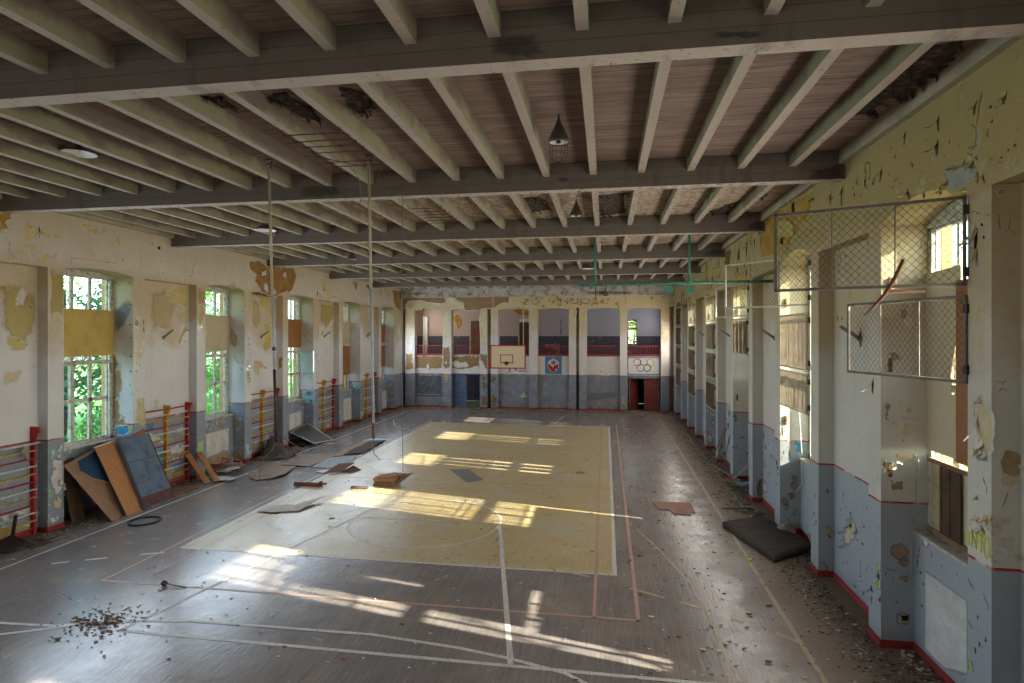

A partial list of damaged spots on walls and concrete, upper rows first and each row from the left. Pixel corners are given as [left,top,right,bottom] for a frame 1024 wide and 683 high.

peeling [922,116,985,199]
peeling [0,284,28,307]
peeling [6,336,28,351]
peeling [165,285,204,344]
flaking render [246,260,297,385]
flaking render [392,289,628,408]
flaking render [756,421,803,525]
peeling [970,392,1022,488]
peeling [890,543,988,675]